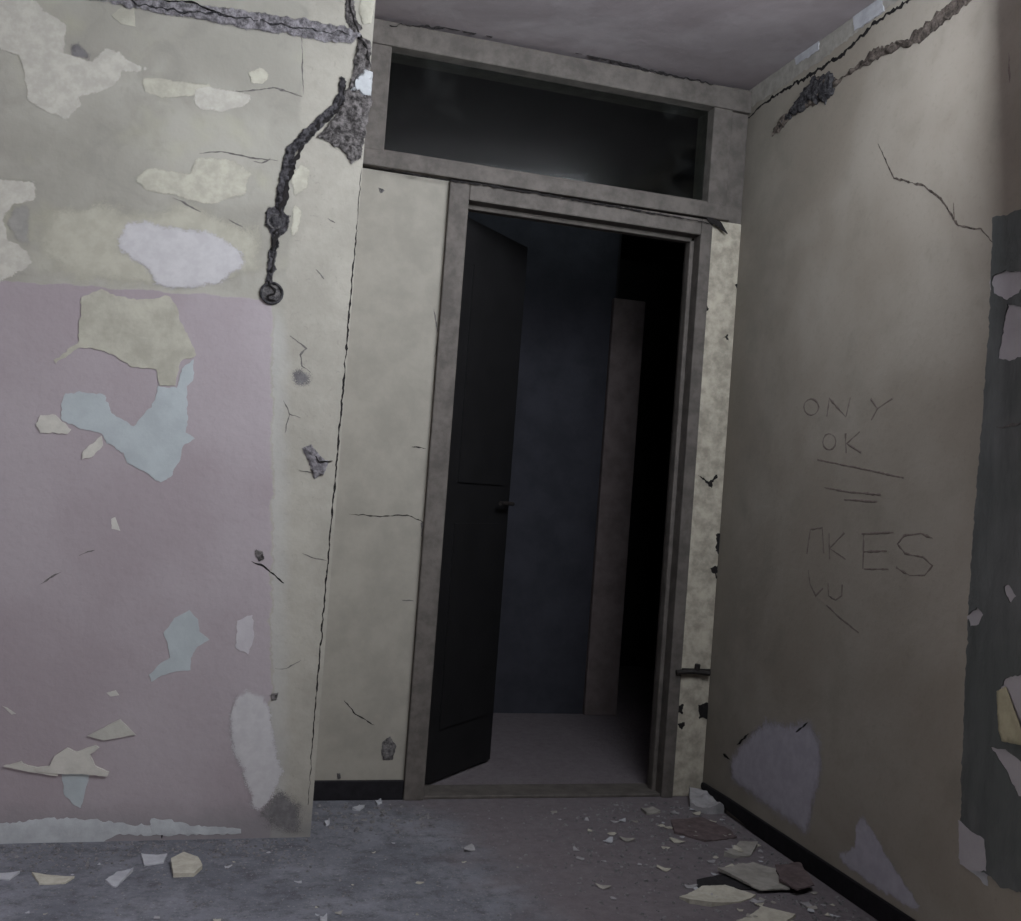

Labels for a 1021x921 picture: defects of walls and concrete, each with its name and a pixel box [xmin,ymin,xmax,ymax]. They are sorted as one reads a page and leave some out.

peeling [0,0,253,120]
crack [89,0,492,97]
crack [576,53,713,85]
crack [748,0,910,118]
peeling [0,178,37,281]
crack [205,151,277,163]
flaking render [265,36,373,283]
crack [878,144,992,242]
peeling [990,271,1021,361]
peeling [36,289,196,482]
flaking render [300,444,330,479]
peeling [0,719,241,844]